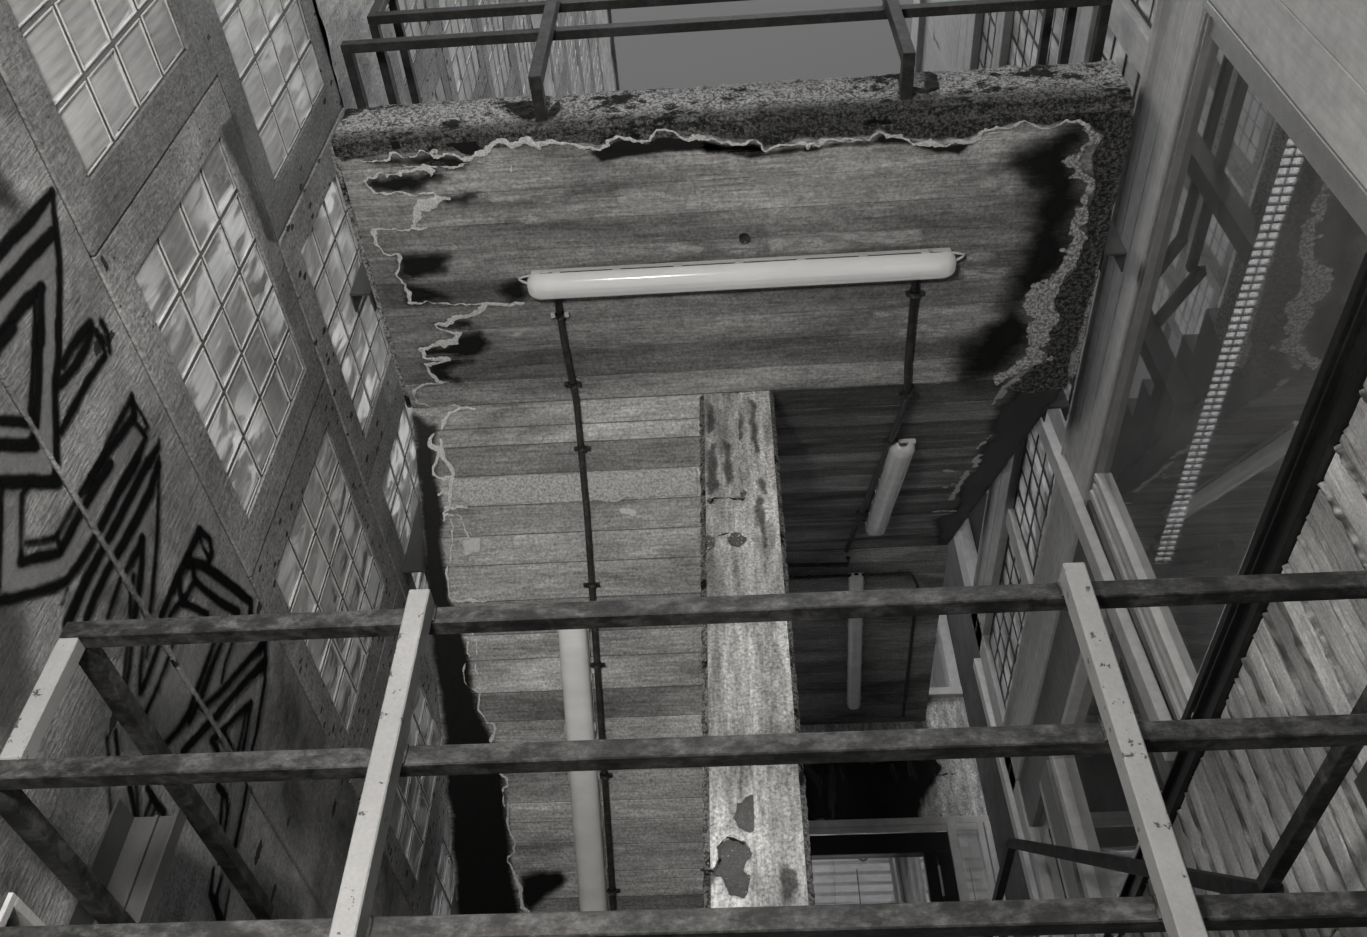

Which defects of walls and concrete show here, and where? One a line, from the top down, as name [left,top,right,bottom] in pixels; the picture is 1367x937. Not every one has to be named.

damp [360,119,1102,607]
damp [432,633,496,745]
damp [446,774,566,915]
spalling [705,794,754,898]
damp [781,868,796,899]